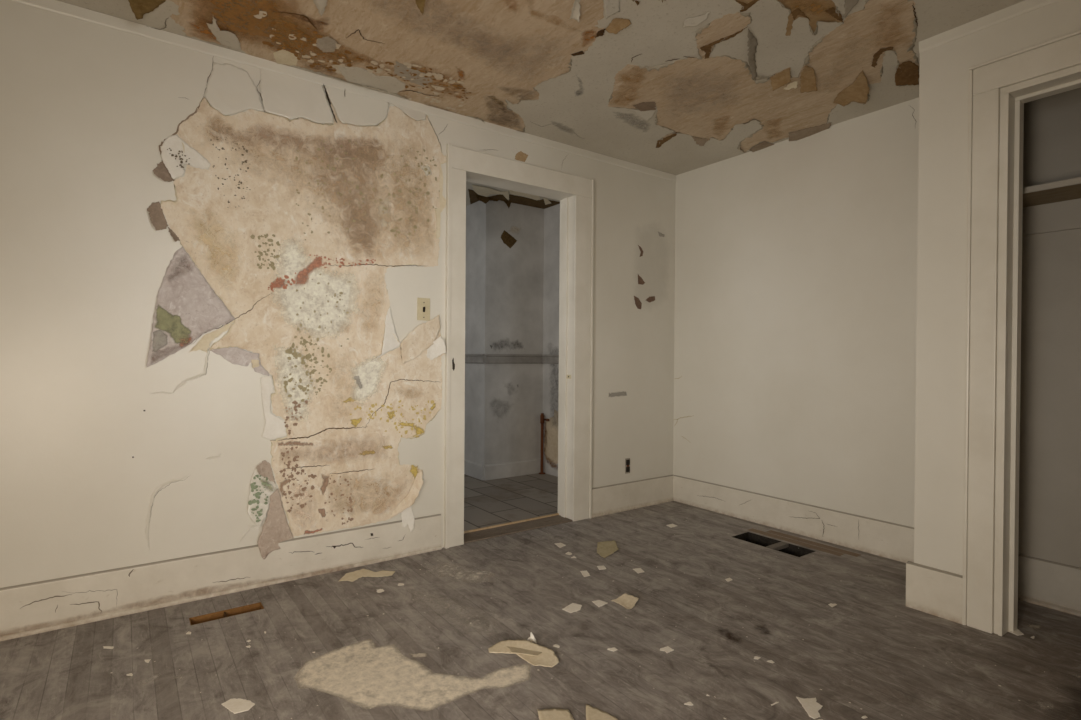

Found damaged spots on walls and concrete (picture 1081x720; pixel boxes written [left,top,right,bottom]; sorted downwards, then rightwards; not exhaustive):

peeling [207,17,241,50]
peeling [273,49,298,65]
crack [323,84,345,122]
leakage [210,128,255,203]
leakage [259,133,440,244]
peeling [512,148,528,162]
peeling [634,274,655,309]
crack [150,293,272,394]
leakage [248,234,376,534]
leakage [343,376,435,438]